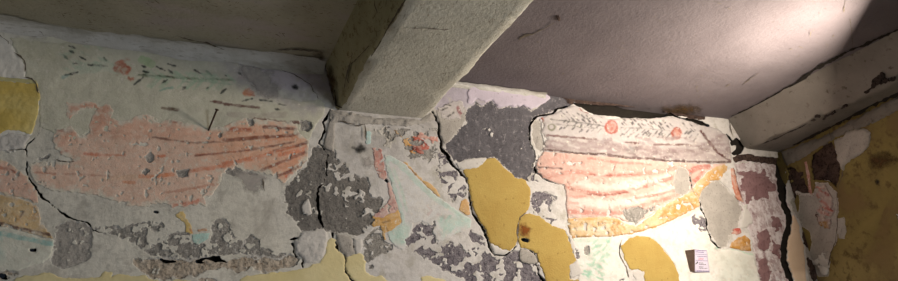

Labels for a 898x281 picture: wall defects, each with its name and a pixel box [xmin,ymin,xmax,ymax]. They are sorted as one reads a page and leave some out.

crack [17,139,102,233]
flaking render [51,146,393,281]
crack [280,49,367,281]
flaking render [405,221,541,281]
crack [432,112,544,281]
flaking render [382,87,633,224]
flaking render [565,230,589,279]
flaking render [619,270,645,281]
flaking render [691,128,871,281]
crack [762,123,808,281]